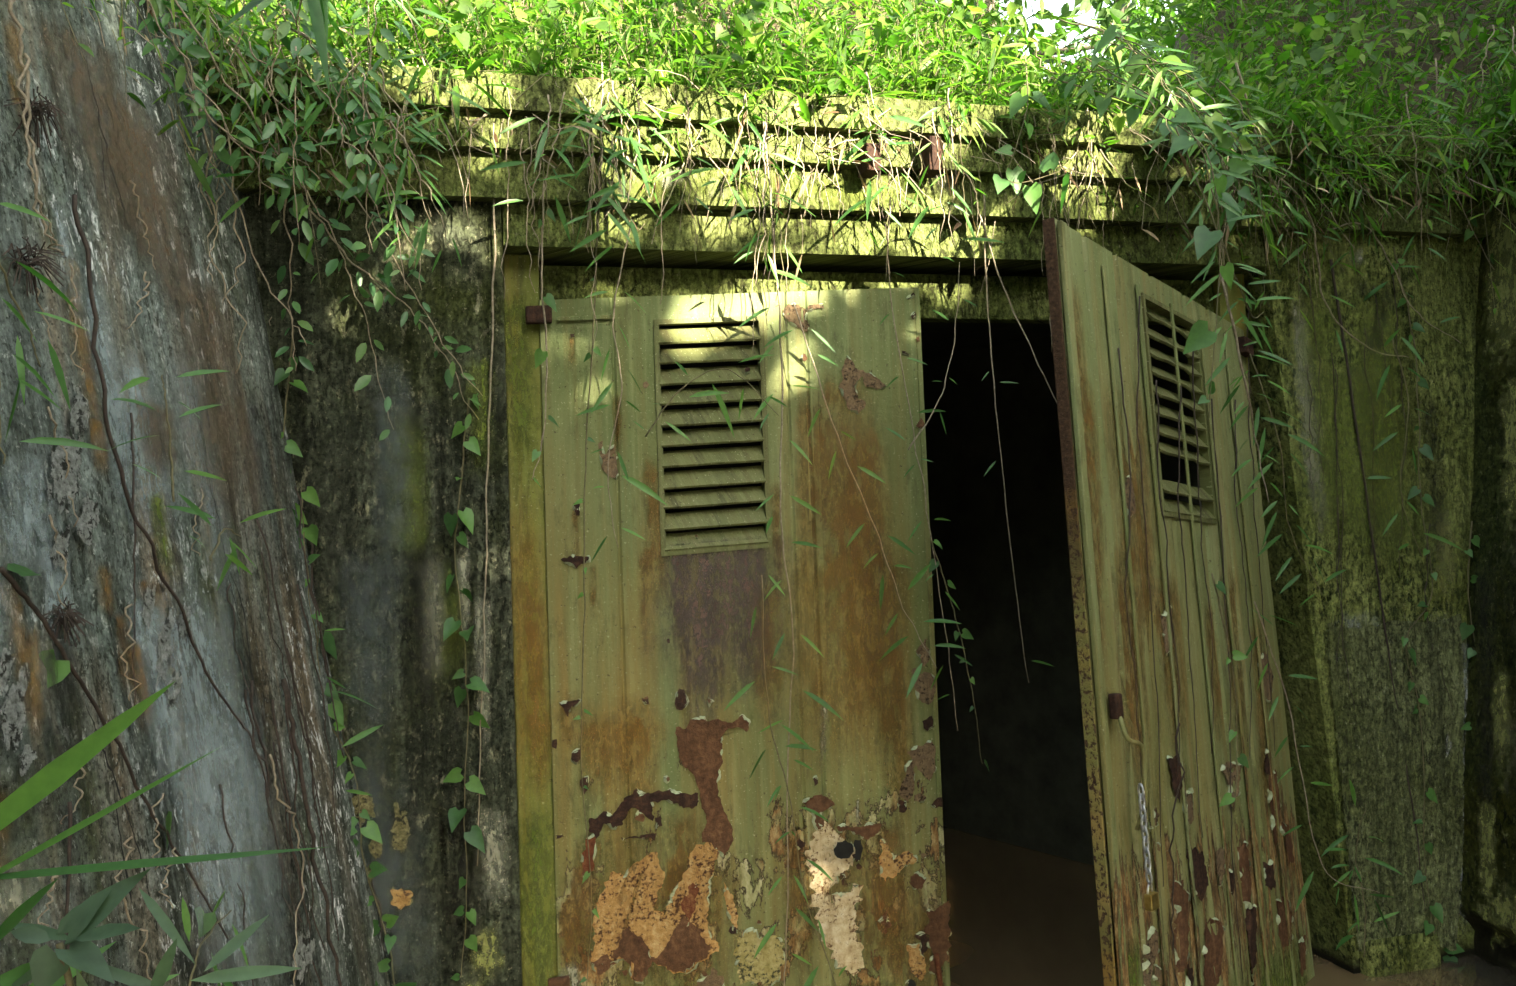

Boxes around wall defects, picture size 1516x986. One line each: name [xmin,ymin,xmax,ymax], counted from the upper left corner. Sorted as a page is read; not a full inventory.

damp [1485,172,1516,363]
damp [1362,308,1405,552]
damp [1499,380,1516,514]
corrosion [561,552,595,572]
damp [415,545,490,753]
peeling [559,699,581,717]
peeling [552,739,589,794]
peeling [897,638,943,813]
damp [1492,673,1516,788]
peeling [588,775,785,986]
peeling [797,820,918,976]
peeling [905,901,952,986]